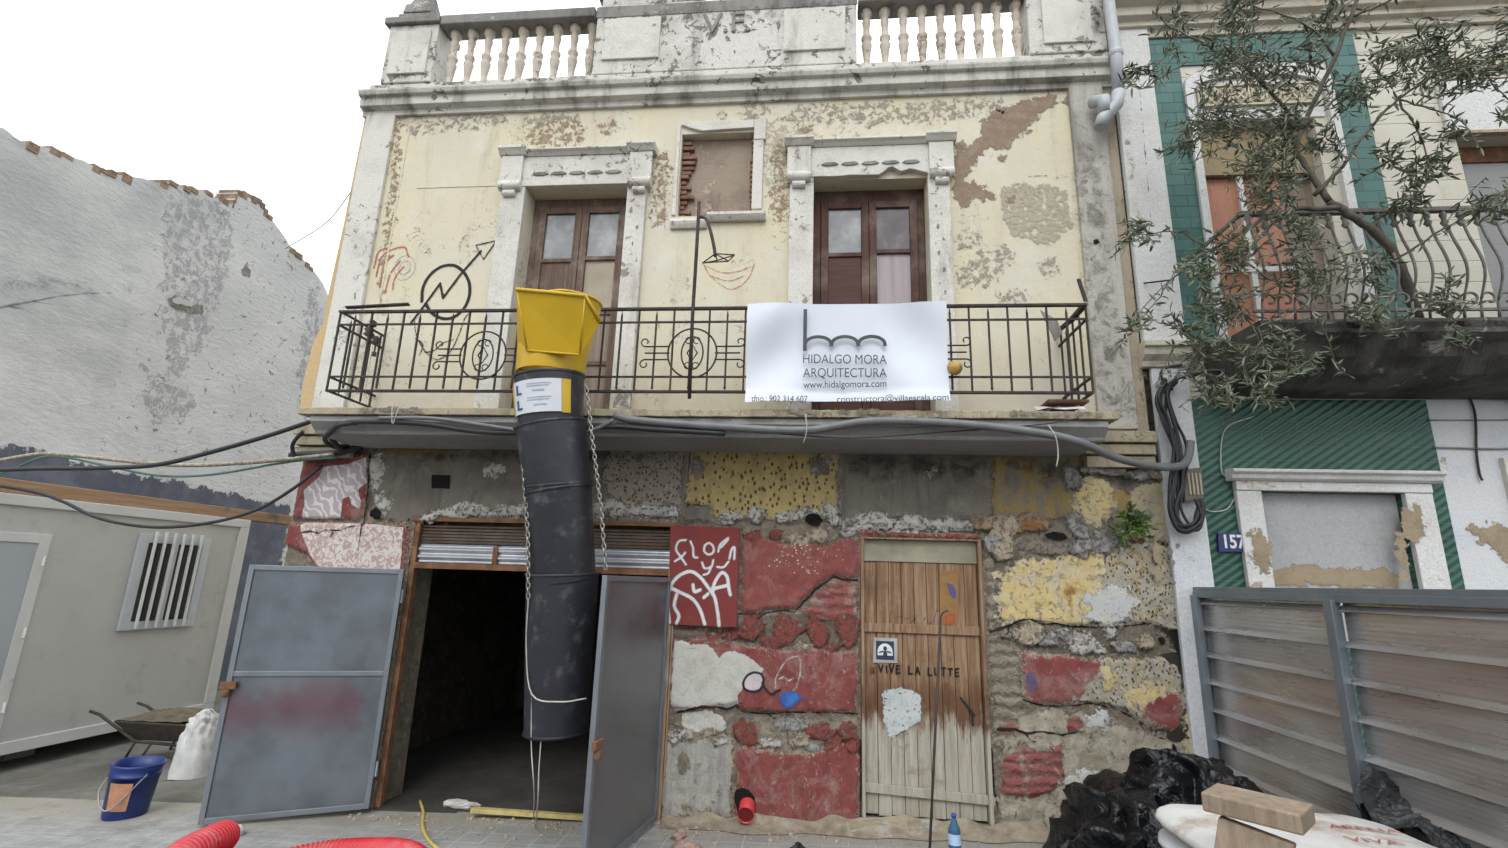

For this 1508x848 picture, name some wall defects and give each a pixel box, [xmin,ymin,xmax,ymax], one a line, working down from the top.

peeling [737,92,1074,304]
hole [168,295,204,315]
peeling [366,452,394,519]
peeling [416,475,525,524]
peeling [483,462,506,480]
flaking render [807,454,833,477]
flaking render [593,456,1163,654]
peeling [1150,535,1180,595]
peeling [1246,527,1274,575]
peeling [1392,502,1429,587]
peeling [1465,520,1508,563]
flaking render [989,618,1176,660]